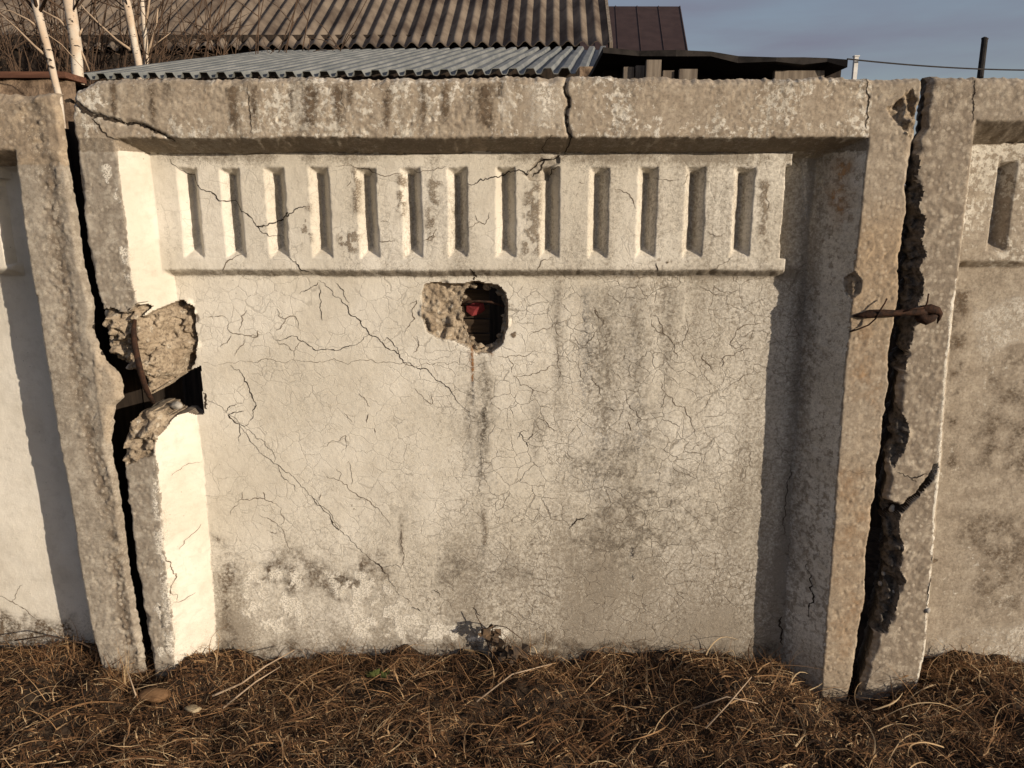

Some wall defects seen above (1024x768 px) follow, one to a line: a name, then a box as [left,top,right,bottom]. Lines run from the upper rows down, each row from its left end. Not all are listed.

crack [469,82,572,185]
crack [863,78,871,129]
spalling [886,88,917,139]
spalling [421,281,516,354]
spalling [102,300,198,466]
crack [64,98,699,611]
crack [651,318,764,400]
crack [857,463,939,518]
water stain [262,558,383,597]
crack [805,564,815,616]